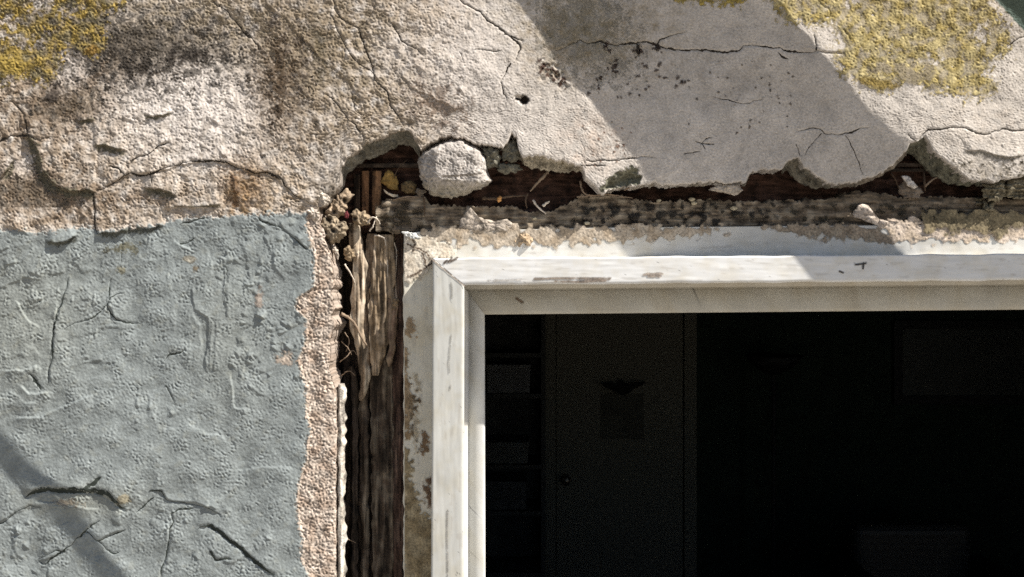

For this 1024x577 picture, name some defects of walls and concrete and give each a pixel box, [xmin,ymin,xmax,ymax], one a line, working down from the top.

crack [460,0,525,98]
crack [559,33,843,59]
crack [0,101,48,142]
crack [92,142,313,235]
crack [258,217,309,250]
flaking render [0,0,1024,210]
crack [581,156,646,166]
peeling [761,209,1024,246]
crack [908,127,1024,141]
peeling [276,213,338,577]
peeling [405,317,431,577]
crack [0,477,275,577]